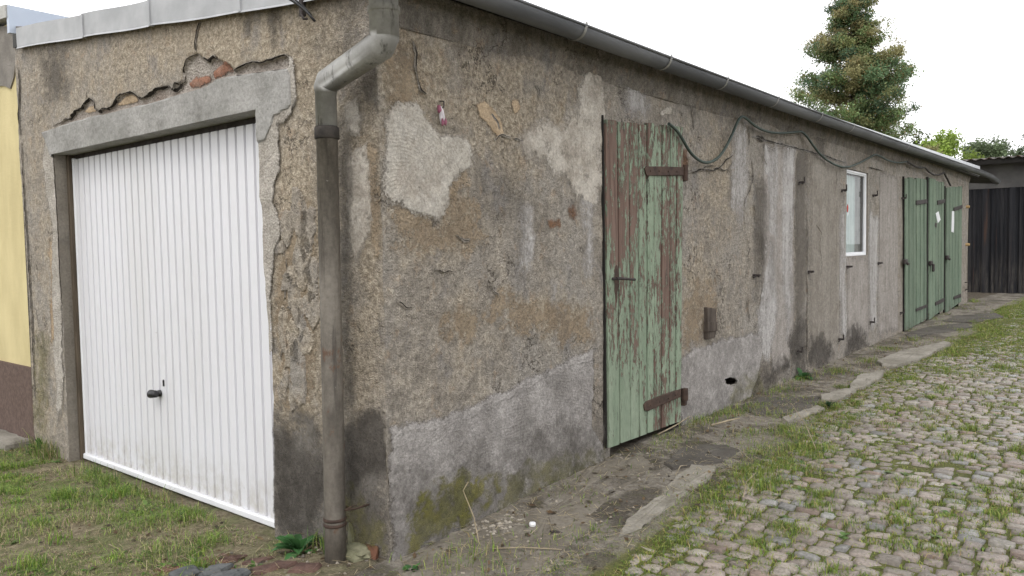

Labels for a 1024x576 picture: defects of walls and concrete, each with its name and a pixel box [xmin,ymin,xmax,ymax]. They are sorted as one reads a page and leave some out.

spalling [61,53,289,125]
peeling [477,101,504,137]
leakage [731,116,831,395]
leakage [272,410,324,546]
leakage [344,408,389,549]